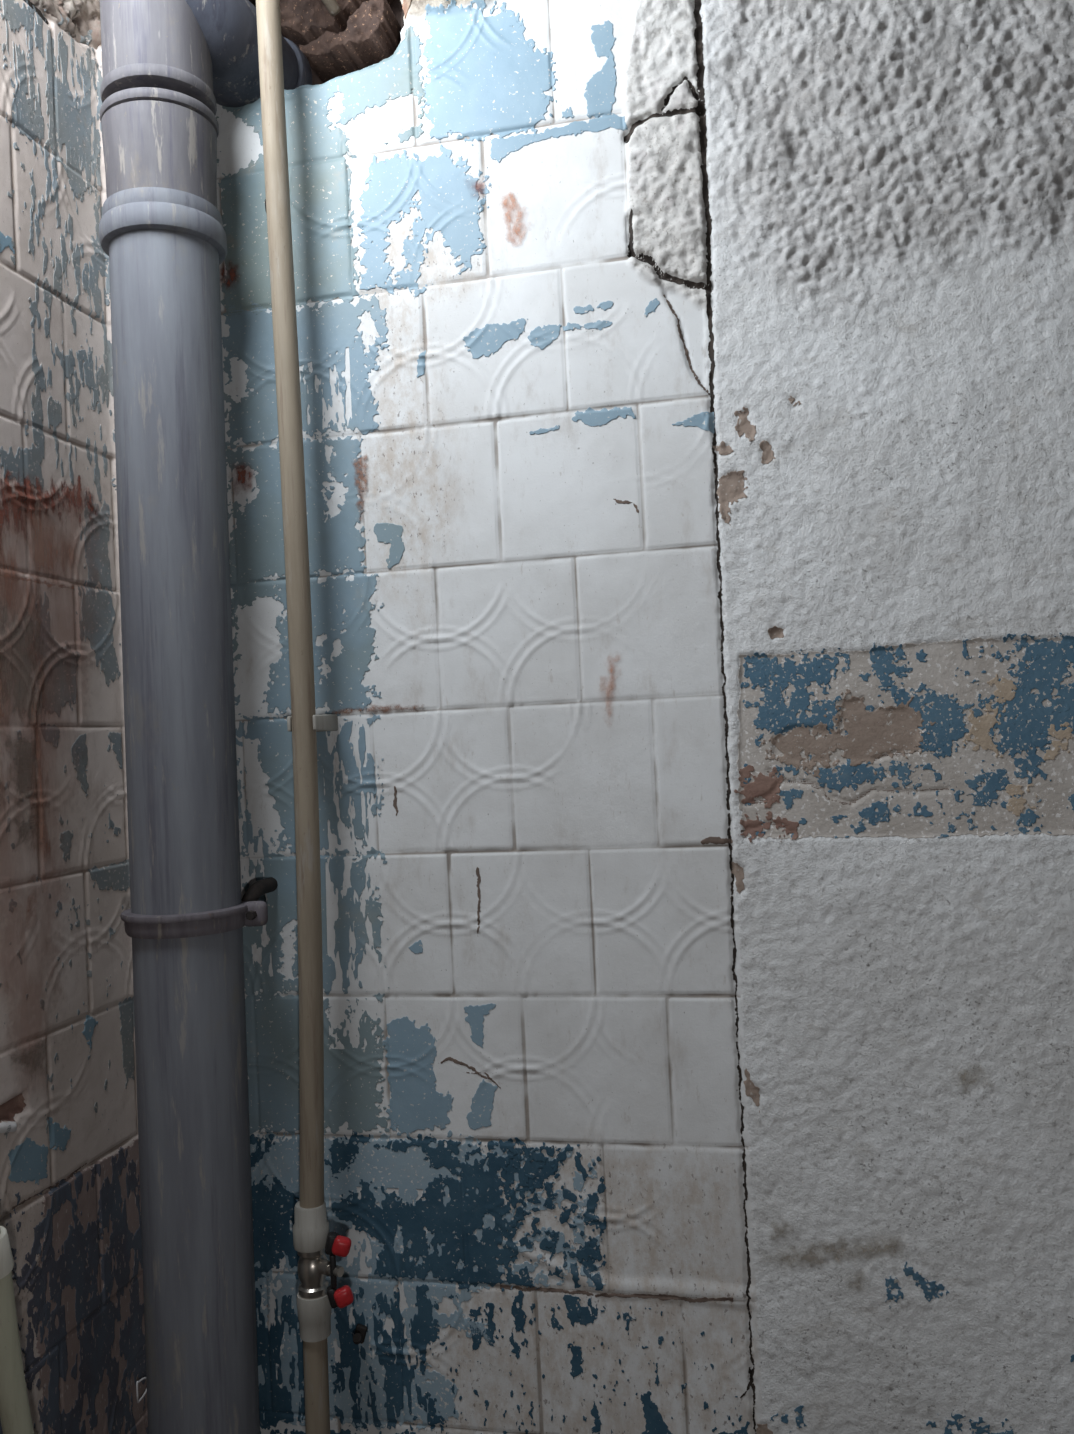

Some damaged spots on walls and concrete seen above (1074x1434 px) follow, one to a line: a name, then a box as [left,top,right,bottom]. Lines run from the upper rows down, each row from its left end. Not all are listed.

rust [0,470,97,542]
peeling [0,0,123,796]
crack [614,499,639,513]
spalling [672,406,776,526]
peeling [216,98,306,1434]
peeling [280,0,683,1434]
crack [623,0,949,1434]
peeling [734,626,1074,842]
crack [441,1057,501,1089]
peeling [0,1093,148,1434]
peeling [885,1262,949,1309]
peeling [703,1396,807,1434]